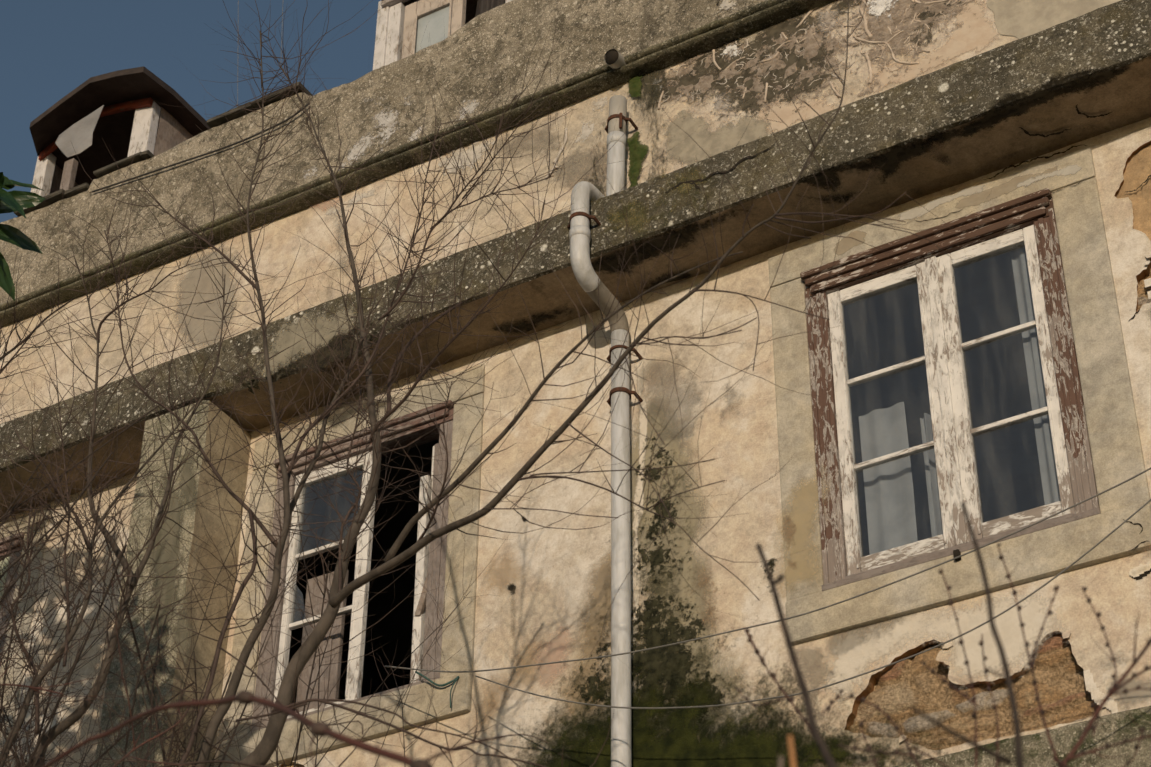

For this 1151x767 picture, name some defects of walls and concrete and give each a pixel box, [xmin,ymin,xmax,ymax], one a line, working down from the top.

damp [589,148,606,195]
damp [634,0,898,181]
flaking render [758,99,834,133]
damp [904,1,961,48]
flaking render [868,0,999,92]
damp [797,55,1151,203]
flaking render [1114,140,1151,315]
damp [630,405,736,719]
damp [562,557,611,718]
flaking render [844,630,1118,751]